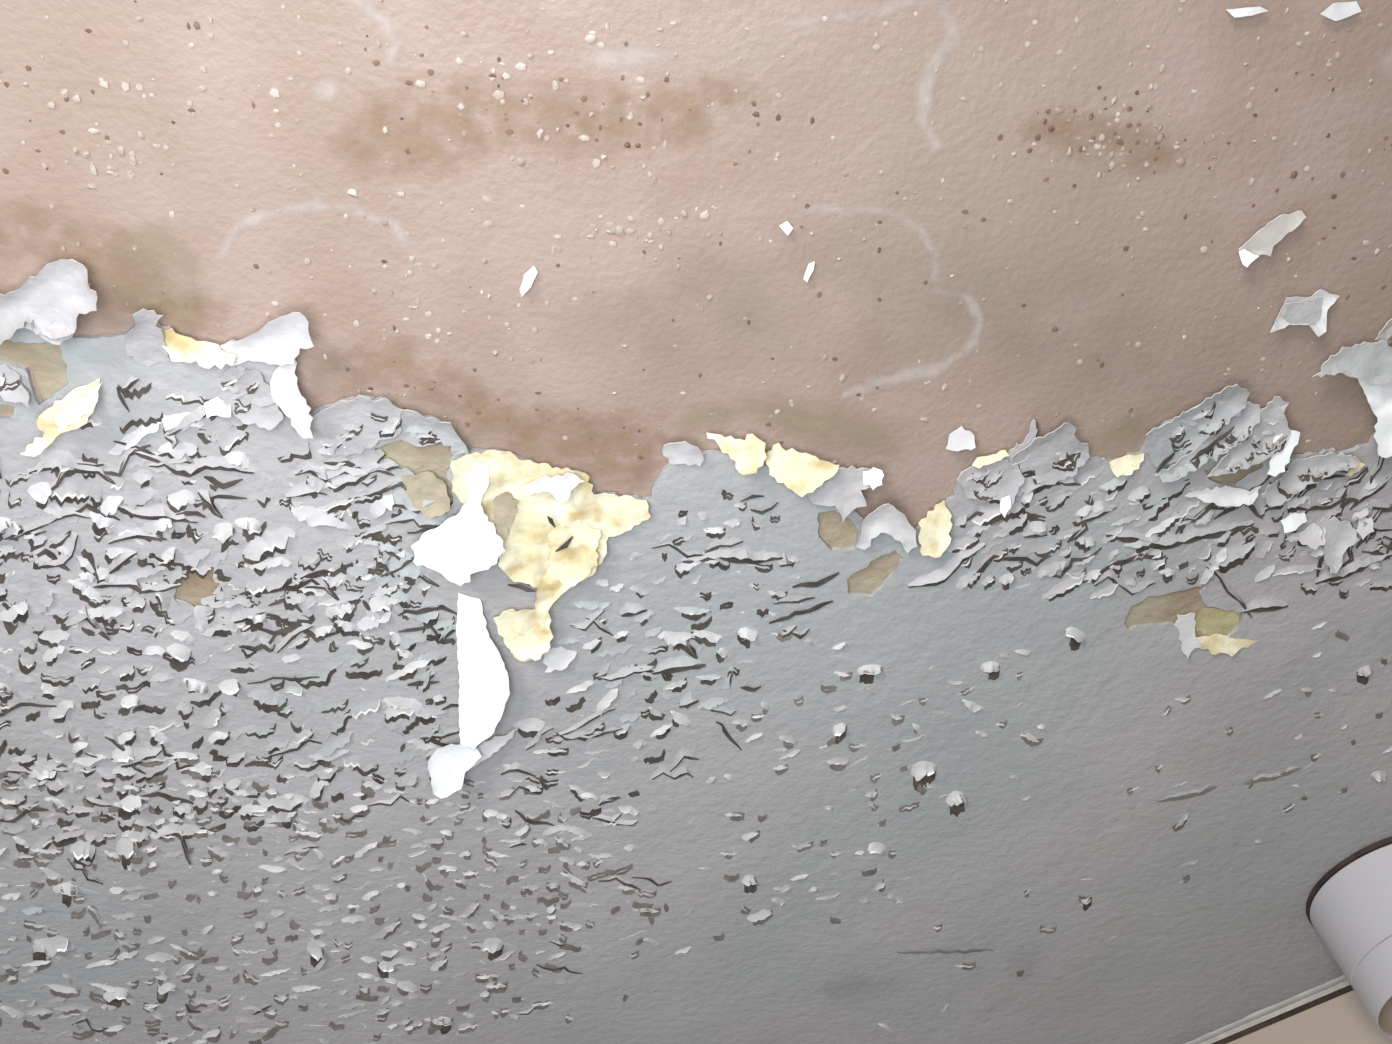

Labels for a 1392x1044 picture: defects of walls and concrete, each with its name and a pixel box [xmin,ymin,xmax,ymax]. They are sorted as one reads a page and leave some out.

flaking render [1027,86,1108,153]
flaking render [1114,90,1165,174]
peeling [803,261,822,298]
peeling [1270,289,1350,337]
peeling [948,649,1031,713]
peeling [1357,659,1390,685]
peeling [976,703,1046,747]
peeling [699,642,966,933]
peeling [1262,753,1322,815]
peeling [1371,746,1392,782]
peeling [1172,813,1188,832]
peeling [1079,878,1095,911]